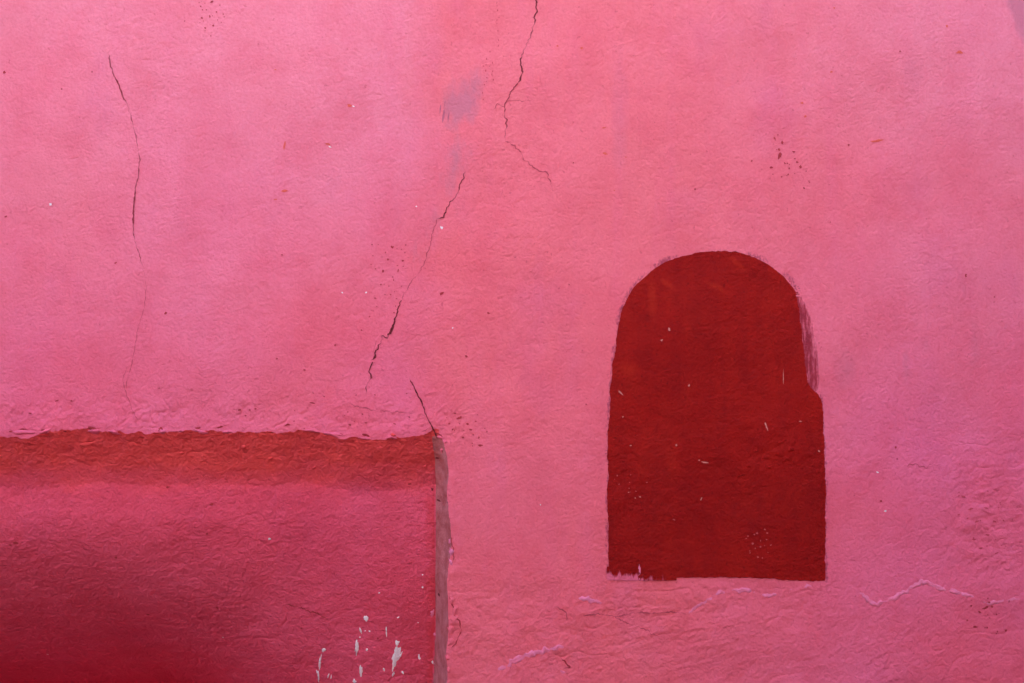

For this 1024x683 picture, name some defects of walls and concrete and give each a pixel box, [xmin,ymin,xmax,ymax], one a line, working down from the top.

crack [493,0,551,182]
crack [109,55,146,421]
crack [344,174,464,438]